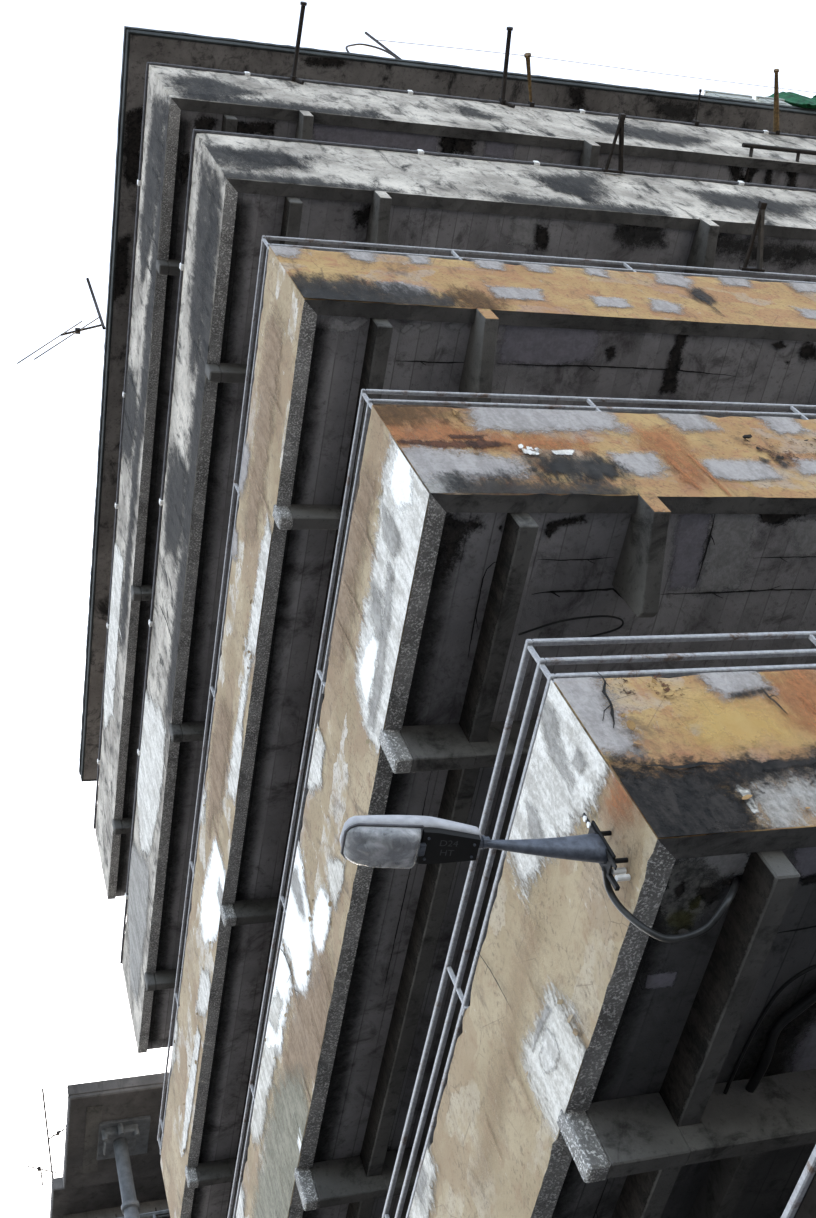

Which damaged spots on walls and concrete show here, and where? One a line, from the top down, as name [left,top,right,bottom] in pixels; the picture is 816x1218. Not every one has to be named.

damp [478,172,676,252]
corrosion [691,288,720,312]
damp [659,335,689,394]
corrosion [373,404,590,453]
crack [660,515,816,598]
crack [597,672,615,728]
corrosion [644,675,682,697]
damp [610,745,816,838]
peeling [250,841,346,1146]
peeling [521,983,586,1141]